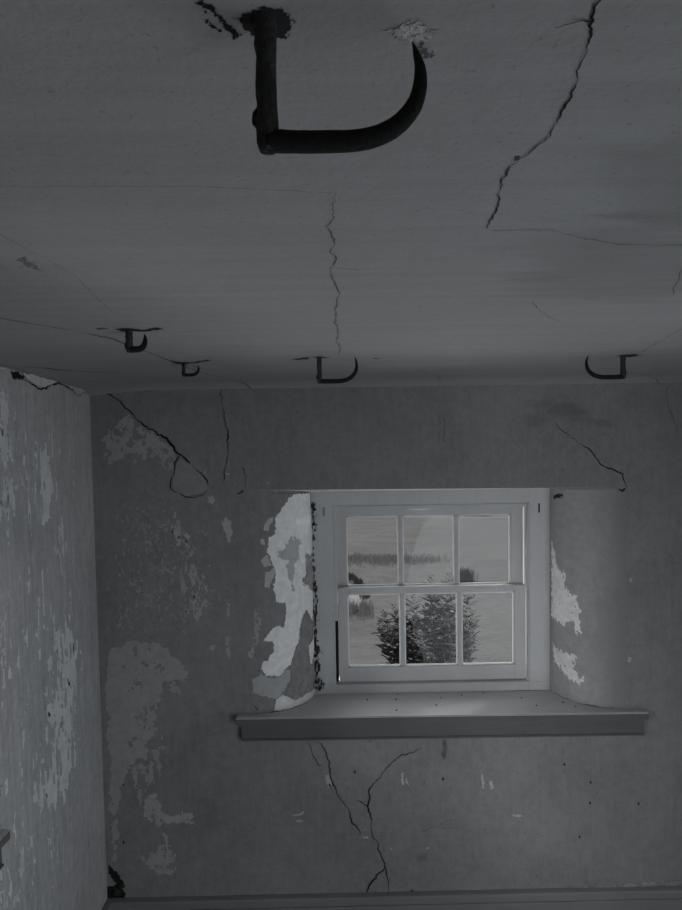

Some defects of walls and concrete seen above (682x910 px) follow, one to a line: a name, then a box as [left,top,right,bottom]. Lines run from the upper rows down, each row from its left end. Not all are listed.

crack [486,0,601,231]
crack [326,200,356,356]
peeling [0,371,72,575]
crack [2,351,251,498]
crack [555,423,627,488]
peeling [247,493,315,711]
peeling [550,488,633,709]
peeling [0,546,83,910]
peeling [103,639,195,898]
crack [309,742,421,893]